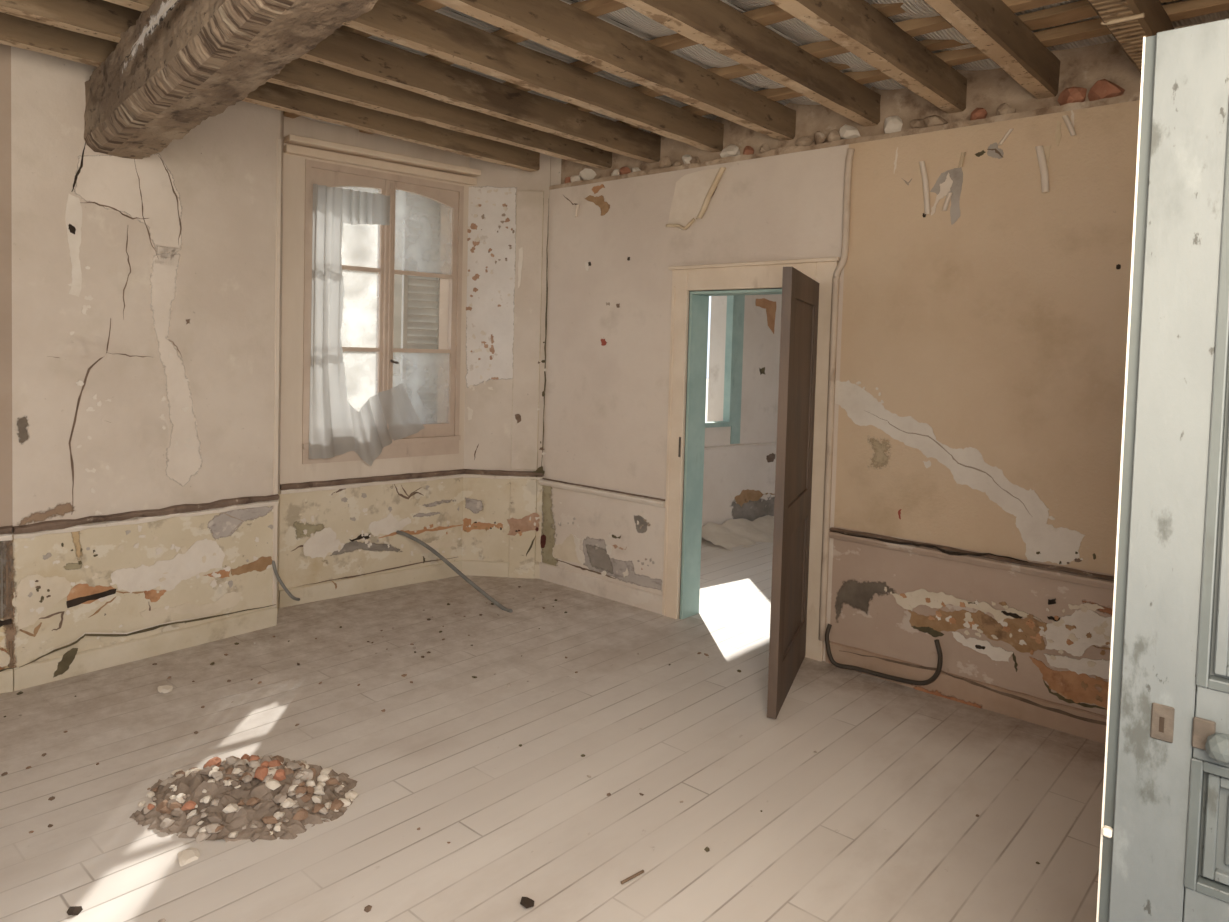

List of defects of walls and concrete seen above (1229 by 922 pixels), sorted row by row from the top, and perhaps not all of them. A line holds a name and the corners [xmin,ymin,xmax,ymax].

peeling [666,167,726,230]
peeling [894,129,1013,225]
crack [69,142,182,515]
peeling [466,186,523,391]
peeling [299,482,540,566]
spalling [735,489,775,507]
crack [866,411,1031,515]
peeling [12,525,278,630]
spalling [884,587,1112,710]